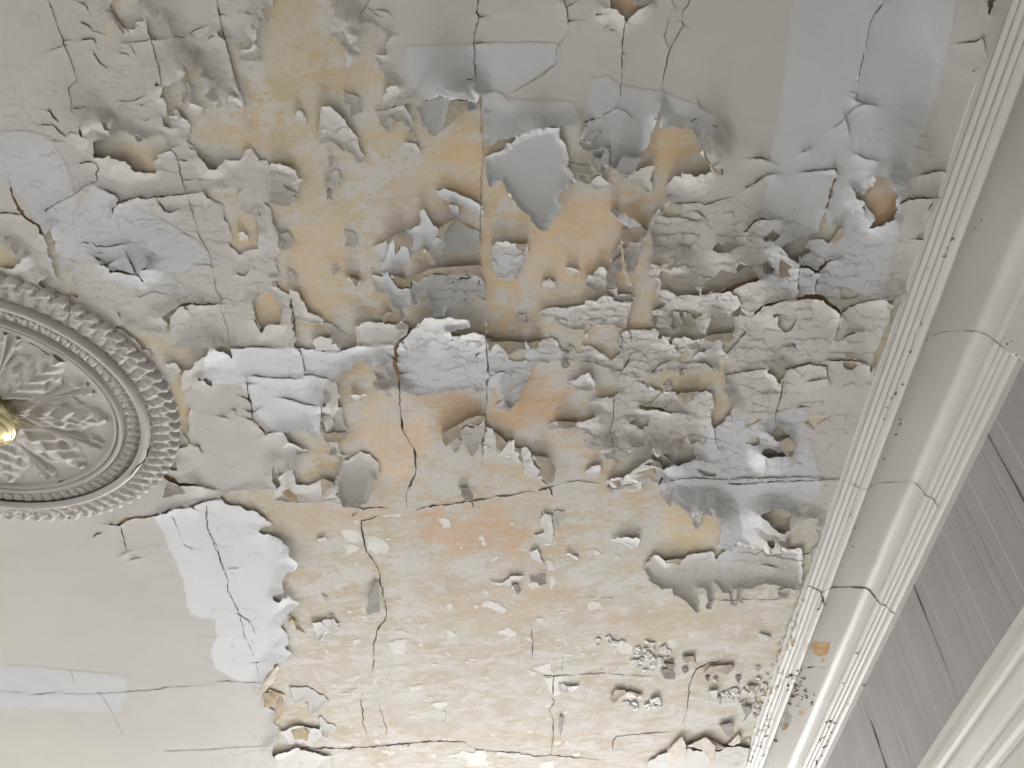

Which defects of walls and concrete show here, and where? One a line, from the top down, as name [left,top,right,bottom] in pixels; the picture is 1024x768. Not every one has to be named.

crack [3,475,259,733]
crack [0,151,329,434]
leakage [168,348,194,431]
leakage [229,188,259,255]
leakage [242,0,665,341]
peeling [67,0,860,768]
crack [352,327,599,669]
crack [298,631,719,760]
leakage [259,362,766,652]
leakage [638,117,705,186]
crack [698,260,881,420]
peeling [858,282,907,375]